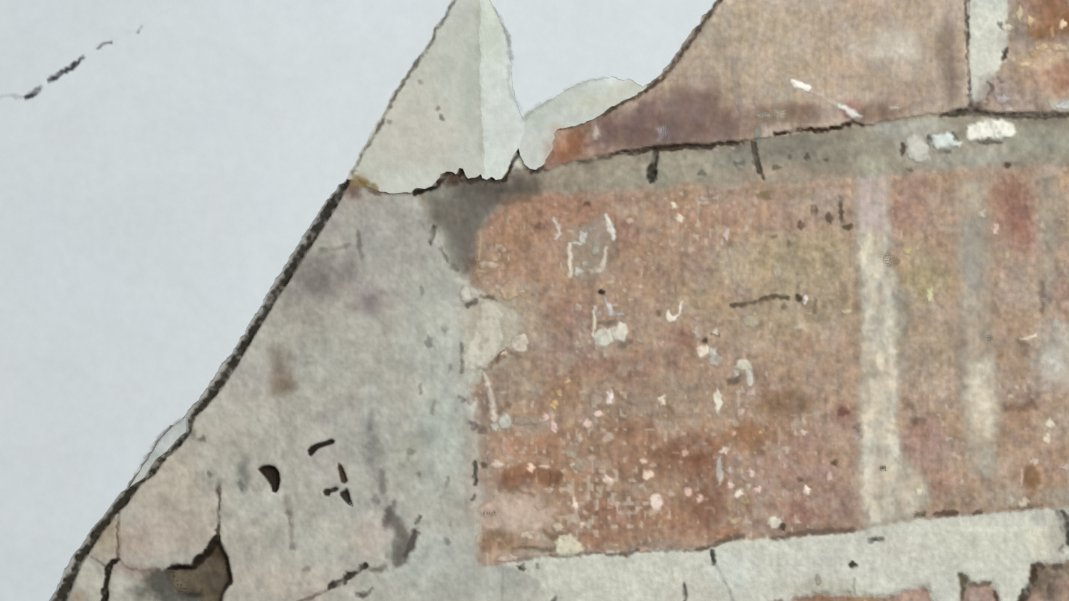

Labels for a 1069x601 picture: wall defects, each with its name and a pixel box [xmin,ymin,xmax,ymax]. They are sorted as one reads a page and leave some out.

crack [25,42,112,99]
flaking render [347,0,648,194]
peeling [906,94,1016,162]
crack [54,1,455,601]
crack [466,295,495,308]
peeling [574,289,644,348]
flaking render [130,417,188,487]
spalling [308,439,334,456]
spalling [324,464,353,506]
crack [471,461,495,514]
peeling [460,281,586,555]
flaking render [167,534,232,601]